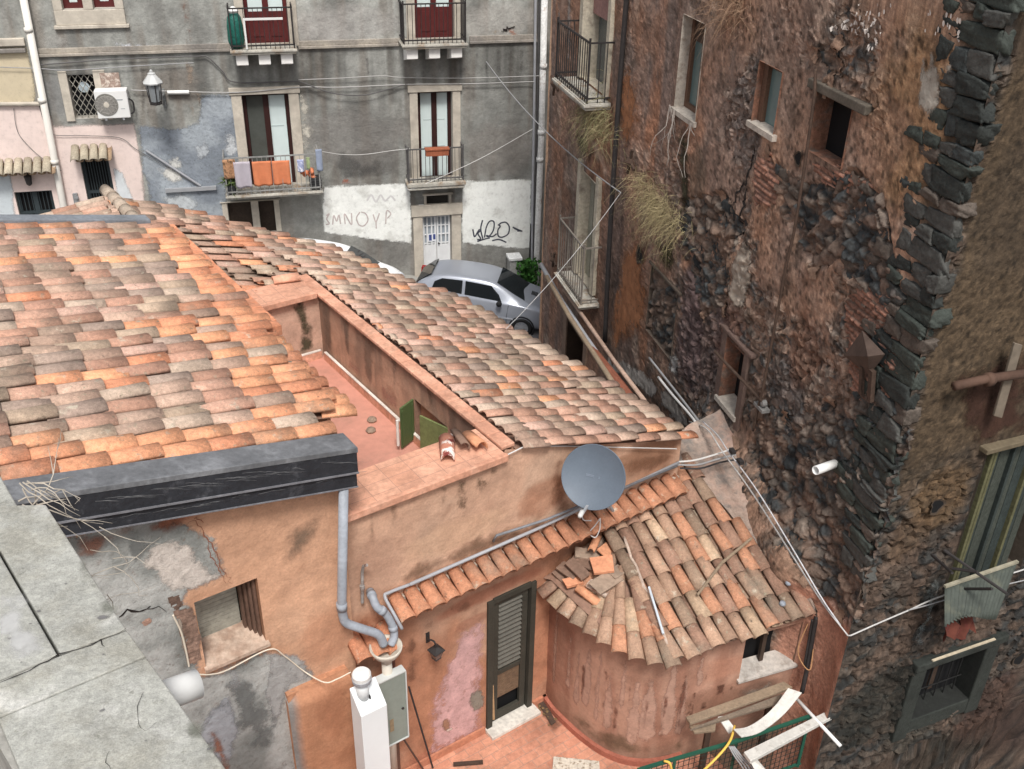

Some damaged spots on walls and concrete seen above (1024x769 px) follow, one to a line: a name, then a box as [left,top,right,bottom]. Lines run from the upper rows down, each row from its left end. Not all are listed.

spalling [672,189,752,323]
crack [731,149,755,238]
spalling [731,0,1024,625]
crack [186,517,231,583]
crack [2,606,165,682]
peeling [67,522,313,769]
peeling [432,624,484,752]
water stain [553,614,706,751]